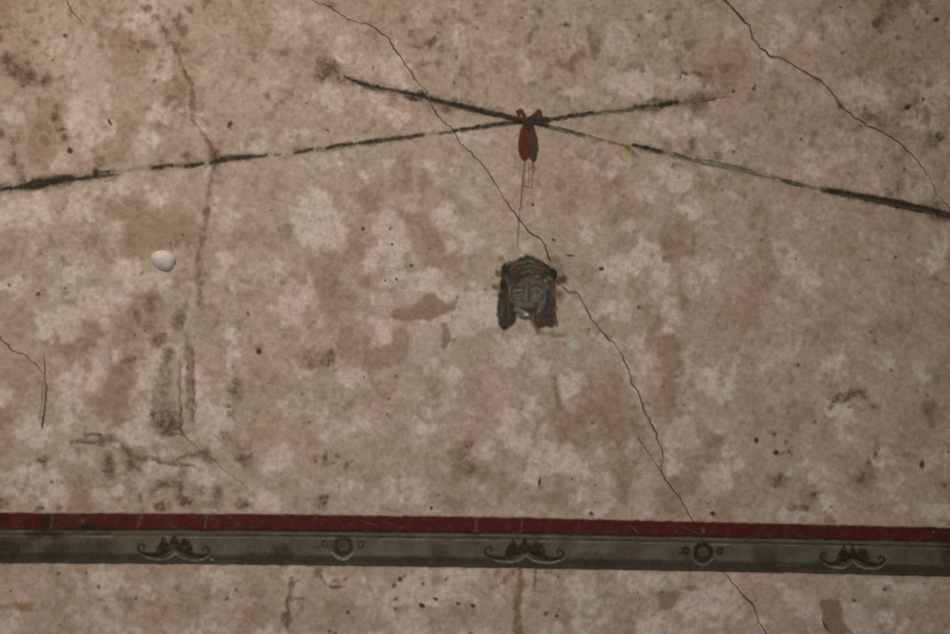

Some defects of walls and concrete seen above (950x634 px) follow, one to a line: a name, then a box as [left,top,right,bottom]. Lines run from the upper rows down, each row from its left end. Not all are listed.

crack [320,3,473,155]
crack [724,0,950,210]
crack [489,174,550,260]
crack [0,336,46,428]
crack [563,287,766,634]